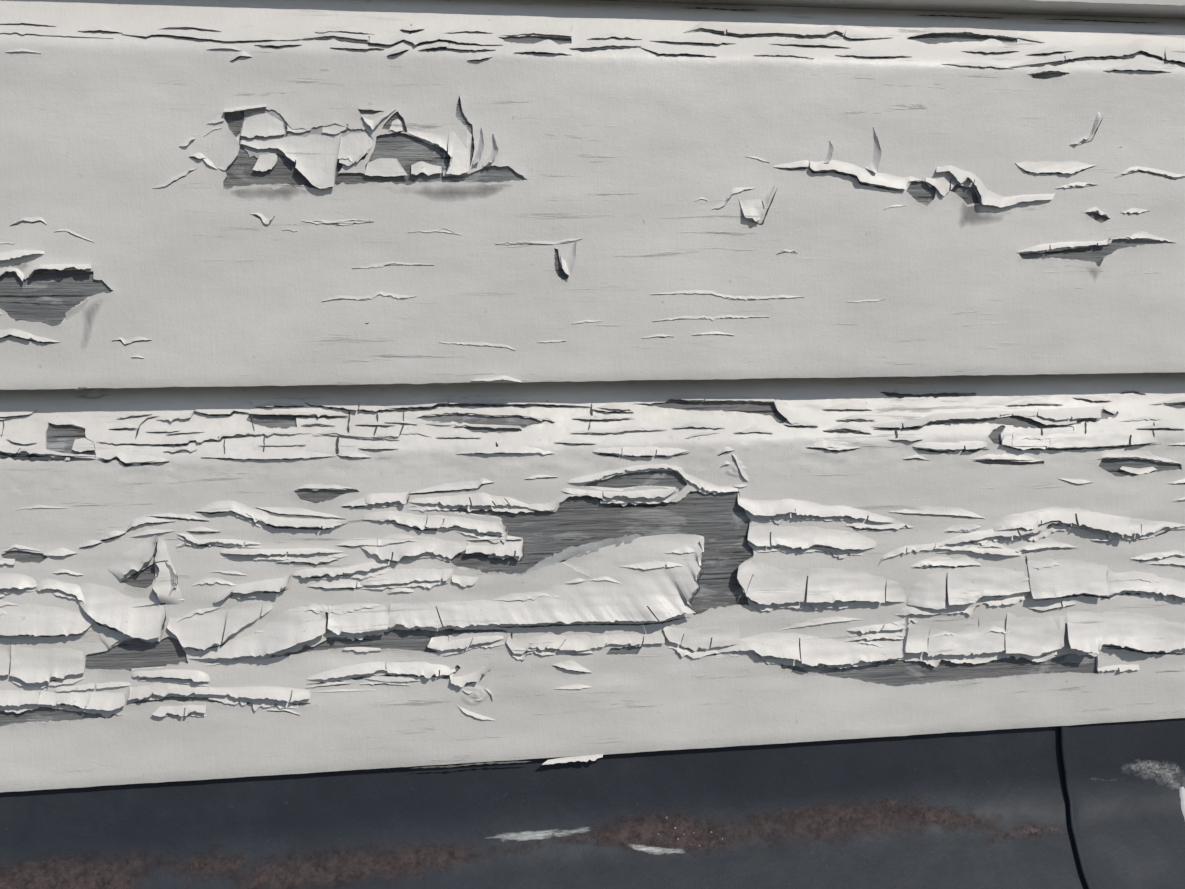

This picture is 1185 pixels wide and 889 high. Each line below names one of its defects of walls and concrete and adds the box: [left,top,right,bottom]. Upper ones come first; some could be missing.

peeling [1029,62,1070,79]
peeling [153,97,527,194]
peeling [746,127,1095,219]
peeling [1117,166,1185,180]
peeling [11,217,94,242]
peeling [695,186,777,225]
peeling [1081,207,1148,223]
peeling [1016,231,1173,266]
peeling [0,242,113,344]
peeling [112,336,152,359]
peeling [0,387,1185,726]
peeling [416,754,603,768]